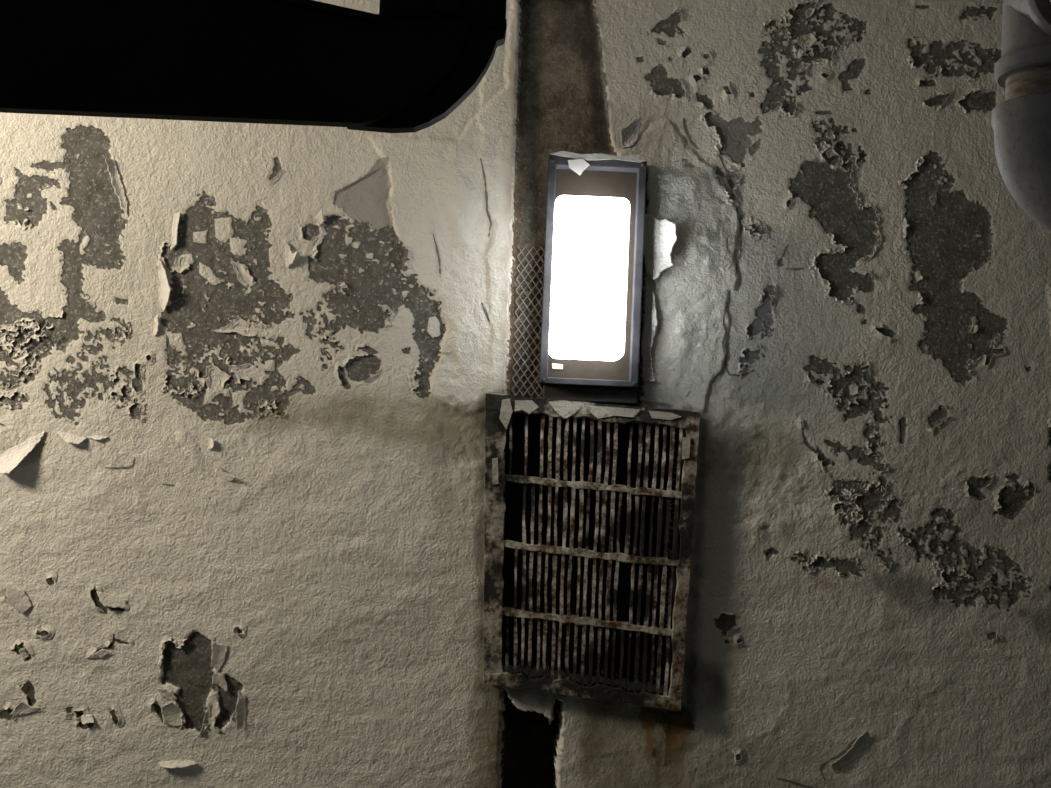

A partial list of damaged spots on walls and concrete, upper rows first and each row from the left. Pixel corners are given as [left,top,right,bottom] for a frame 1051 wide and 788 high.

peeling [0,124,447,474]
crack [683,118,743,277]
crack [722,310,755,376]
peeling [636,0,871,241]
peeling [736,285,779,377]
peeling [783,110,896,343]
peeling [898,150,1009,386]
peeling [791,355,1031,611]
peeling [964,465,1051,520]
spalling [148,632,246,737]
spalling [499,691,561,788]
peeling [831,731,872,772]